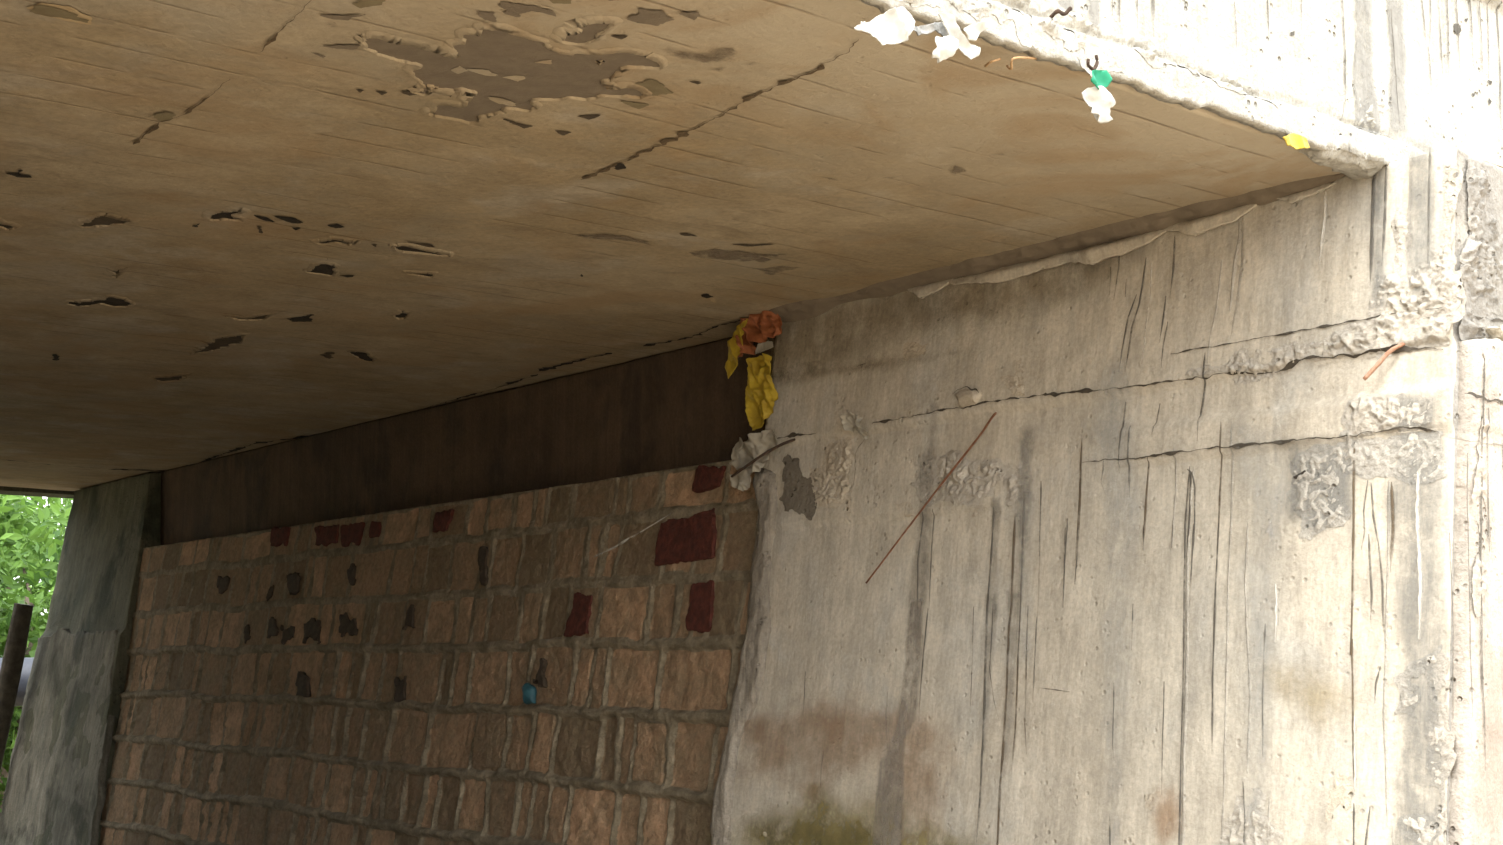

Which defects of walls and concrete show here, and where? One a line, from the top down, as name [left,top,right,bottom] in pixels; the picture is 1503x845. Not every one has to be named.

peeling [311,0,733,135]
crack [581,39,859,180]
spalling [897,0,1125,76]
spalling [59,266,136,308]
spalling [186,312,314,355]
spalling [193,206,455,278]
peeling [679,233,784,274]
crack [854,307,1503,478]
spalling [779,454,817,520]
leakage [1063,441,1082,593]
leakage [874,510,935,845]
leakage [970,486,1062,845]